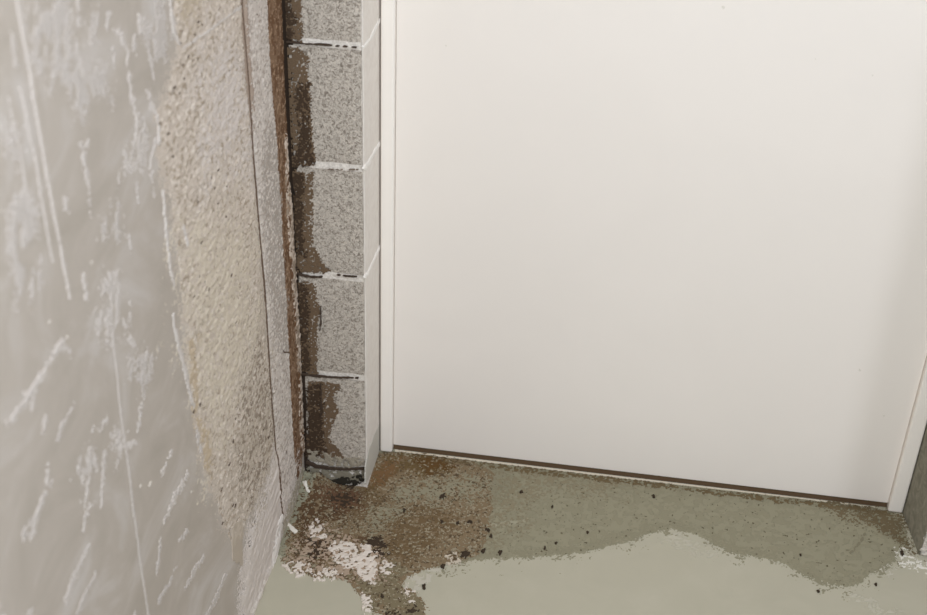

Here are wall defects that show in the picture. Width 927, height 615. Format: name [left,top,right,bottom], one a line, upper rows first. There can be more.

damp [70,0,347,615]
crack [241,0,365,524]
damp [298,423,927,615]